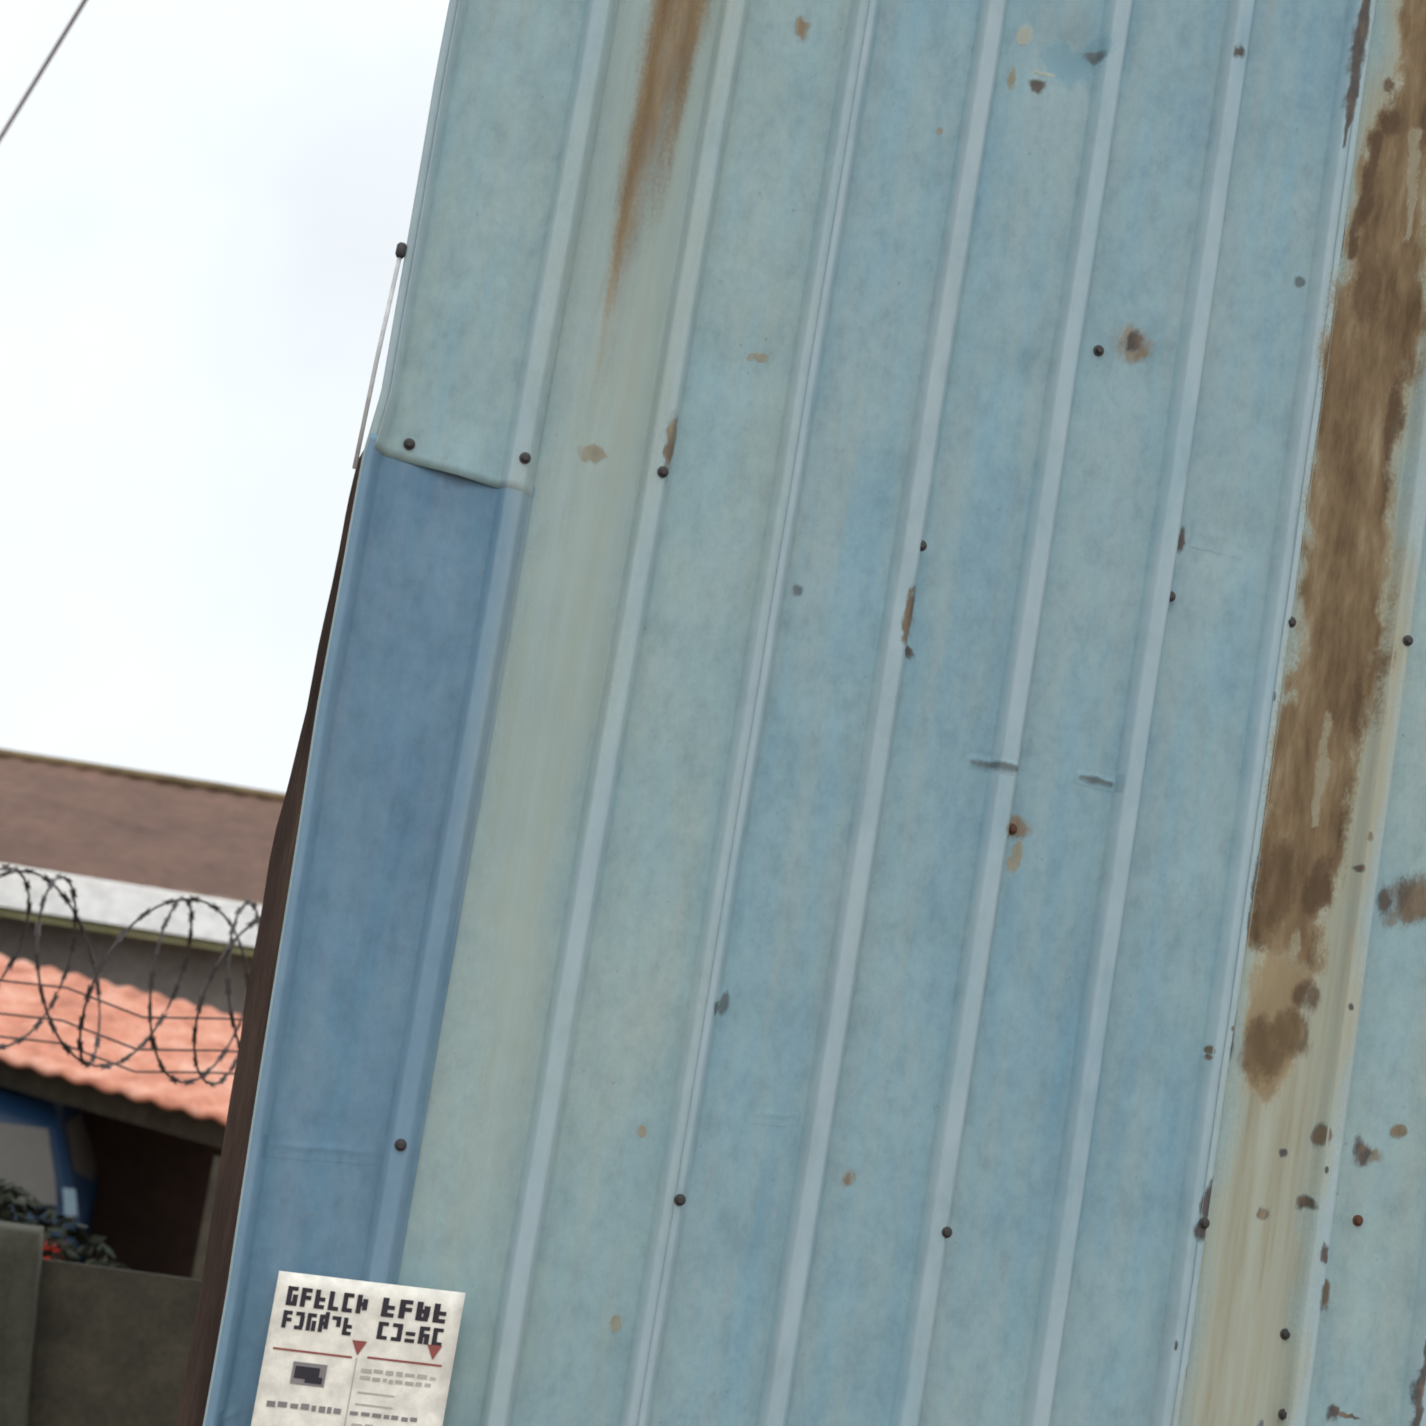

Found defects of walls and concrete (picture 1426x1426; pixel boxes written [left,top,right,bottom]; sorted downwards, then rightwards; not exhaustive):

rust [615,0,704,260]
rust [1118,327,1150,363]
rust [663,418,678,467]
rust [1204,0,1426,1102]
rust [902,586,915,659]
rust [1311,1123,1332,1146]
rust [1353,1136,1380,1166]
rust [1390,1124,1407,1139]
rust [1296,1195,1317,1209]
rust [1321,1243,1330,1310]
rust [1410,1341,1426,1426]
rust [1326,1404,1340,1420]